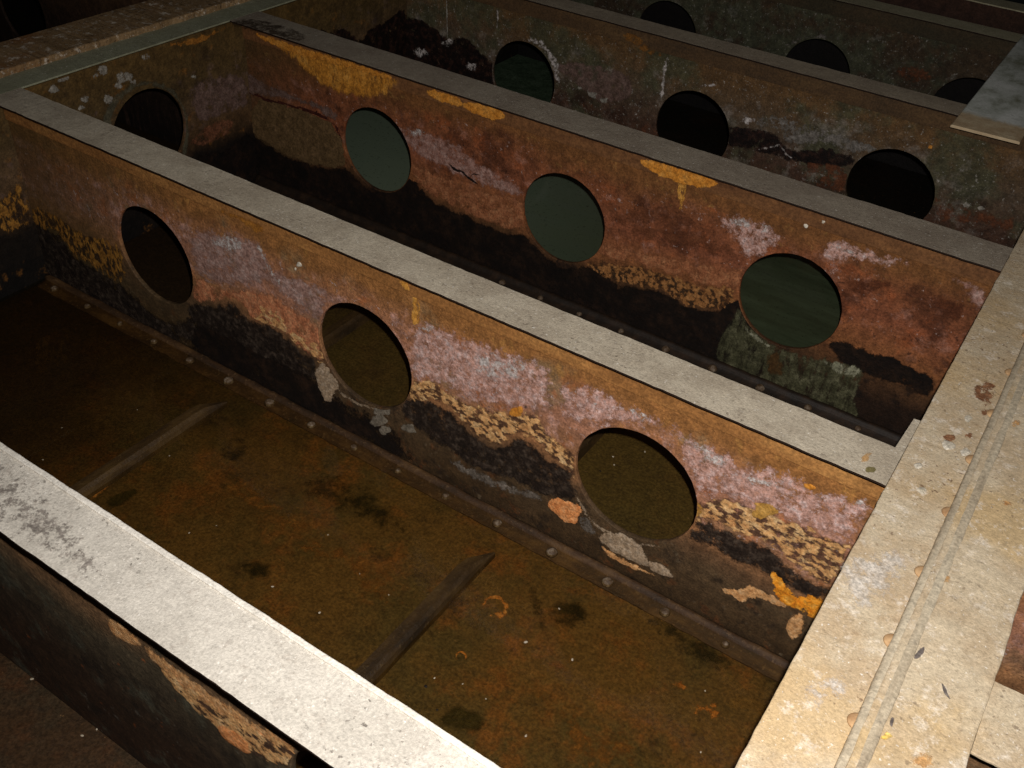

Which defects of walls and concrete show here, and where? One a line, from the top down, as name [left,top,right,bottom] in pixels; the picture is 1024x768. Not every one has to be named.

spalling [320,10,494,85]
crack [449,164,478,185]
damp [189,127,933,416]
corrosion [587,160,743,309]
peeling [315,363,339,402]
corrosion [410,381,574,478]
damp [402,323,872,540]
corrosion [548,497,610,533]
peeling [599,532,673,578]
corrosion [695,499,852,584]
corrosion [722,572,824,619]
peeling [786,614,804,640]